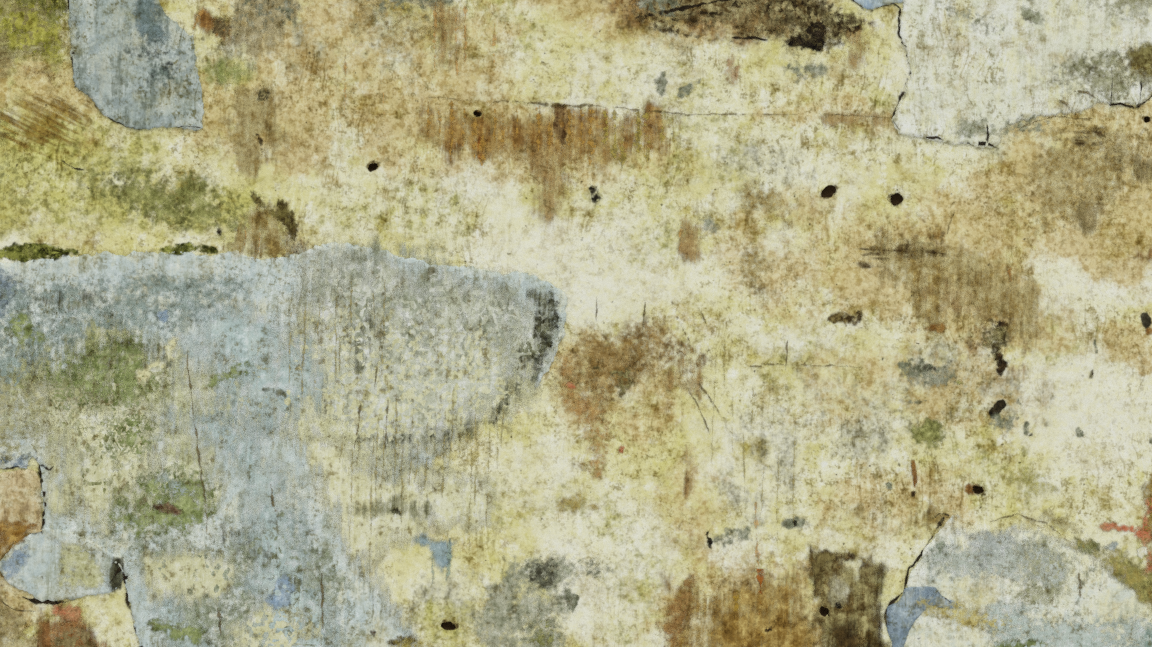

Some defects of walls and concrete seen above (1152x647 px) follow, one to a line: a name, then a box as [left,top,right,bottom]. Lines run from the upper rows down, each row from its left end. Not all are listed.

peeling [68,0,204,131]
water stain [727,59,740,82]
water stain [637,0,870,68]
peeling [854,0,1152,149]
corrosion [421,100,675,221]
peeling [0,241,568,647]
corrosion [559,322,706,477]
peeling [809,515,1152,647]
corrosion [1100,477,1152,574]